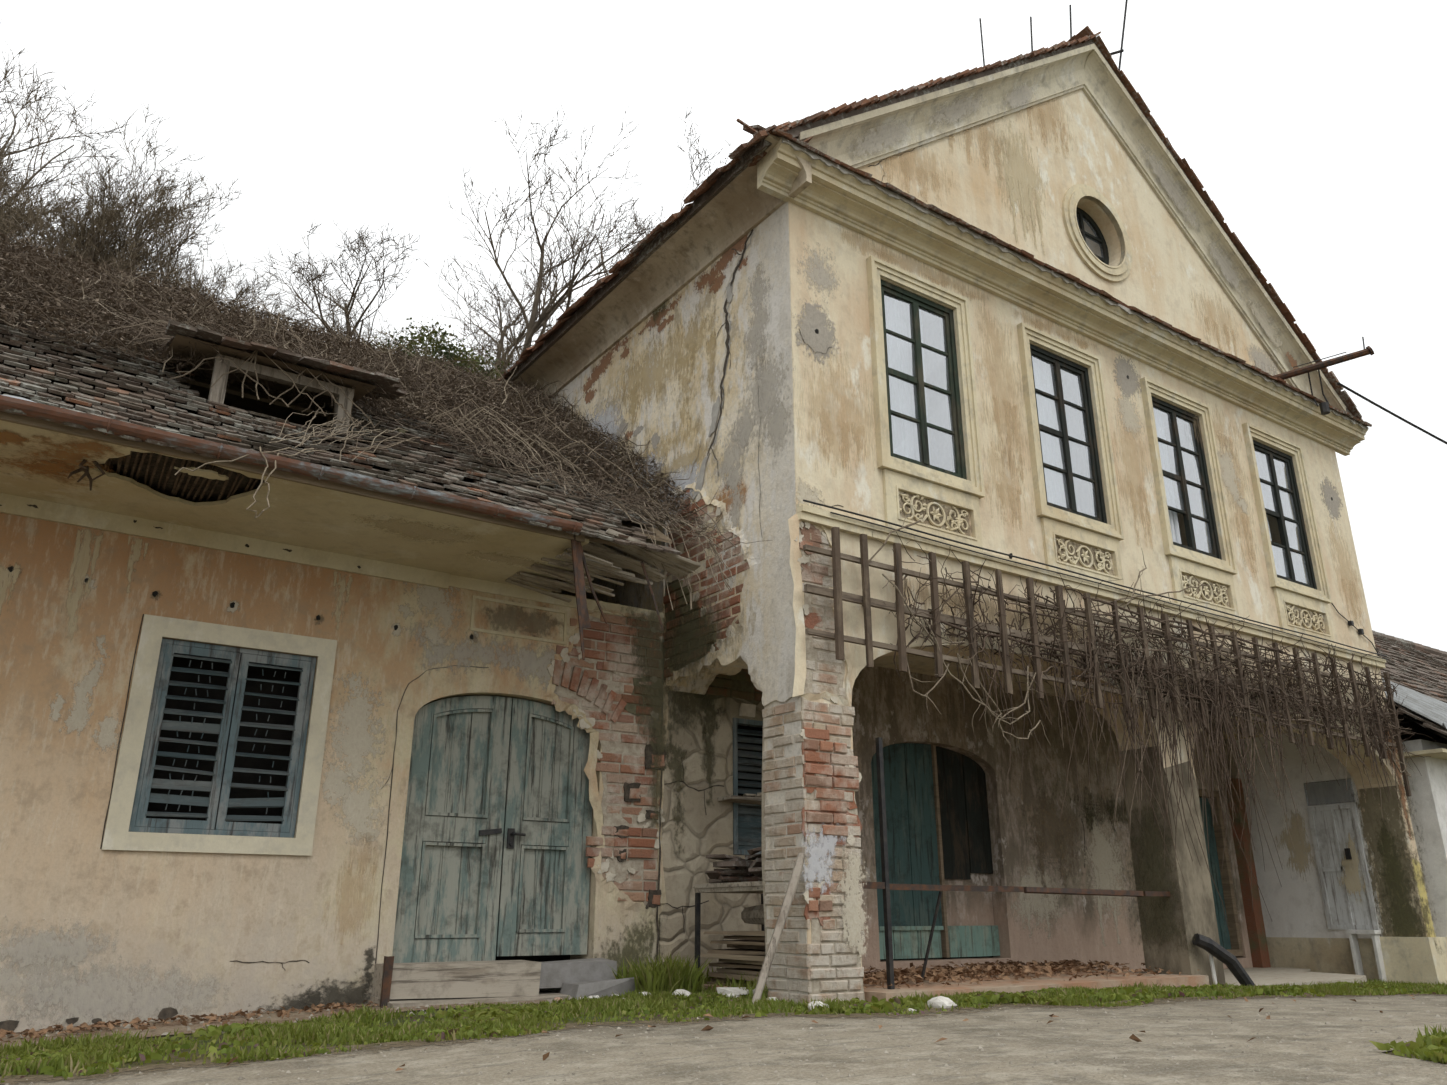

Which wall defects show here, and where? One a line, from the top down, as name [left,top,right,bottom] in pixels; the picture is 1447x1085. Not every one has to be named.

flaking render [174,466,229,481]
peeling [583,234,748,404]
crack [707,229,762,535]
water stain [993,125,1045,255]
flaking render [782,138,1369,430]
flaking render [544,477,865,1003]